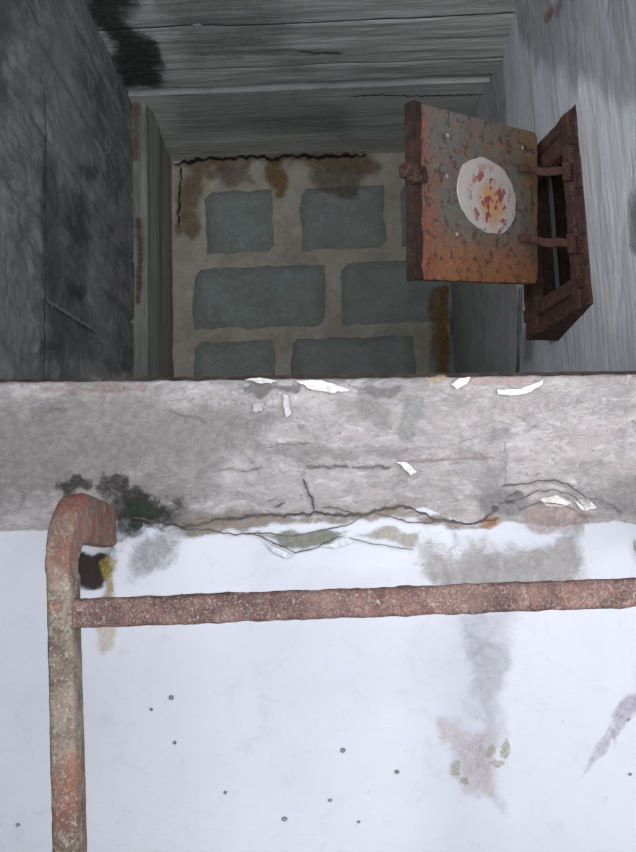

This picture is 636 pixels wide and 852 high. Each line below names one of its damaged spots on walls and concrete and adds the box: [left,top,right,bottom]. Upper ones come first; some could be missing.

leakage [0,392,249,570]
crack [117,444,624,537]
peeling [249,526,418,558]
leakage [424,527,580,585]